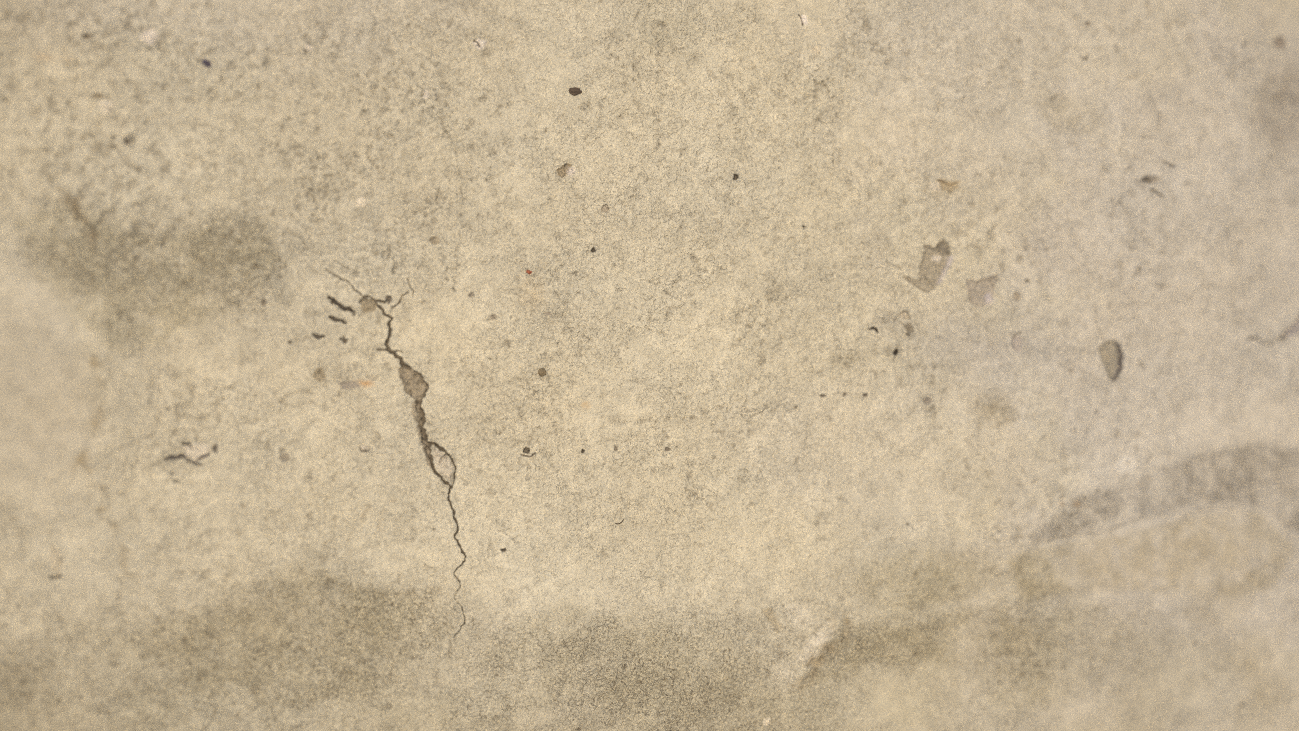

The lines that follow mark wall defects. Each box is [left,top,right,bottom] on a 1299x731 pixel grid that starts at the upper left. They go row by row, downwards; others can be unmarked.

hole [1088,296,1128,387]
crack [1244,312,1299,349]
crack [255,208,472,642]